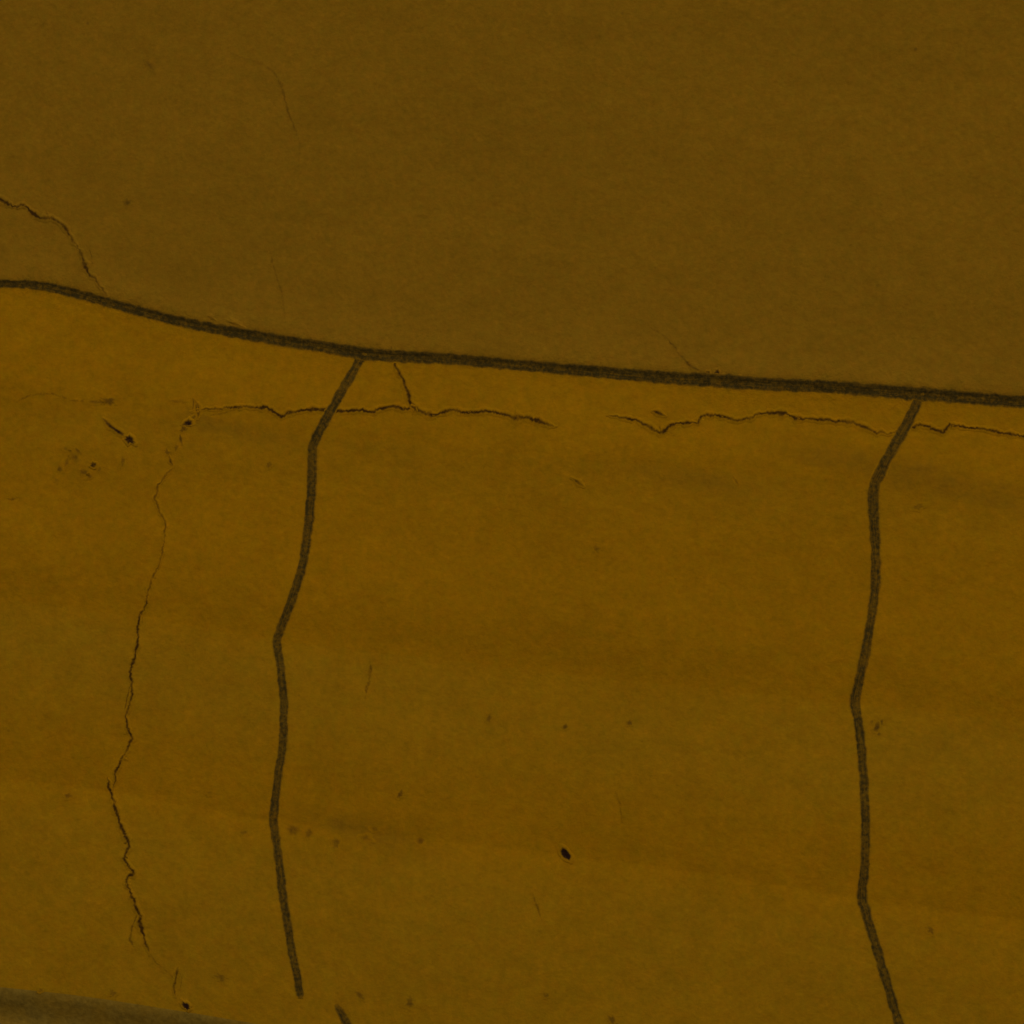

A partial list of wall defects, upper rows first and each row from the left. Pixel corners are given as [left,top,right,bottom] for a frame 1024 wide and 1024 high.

crack [0,194,109,297]
crack [189,346,558,430]
crack [606,406,1024,441]
crack [104,467,184,998]